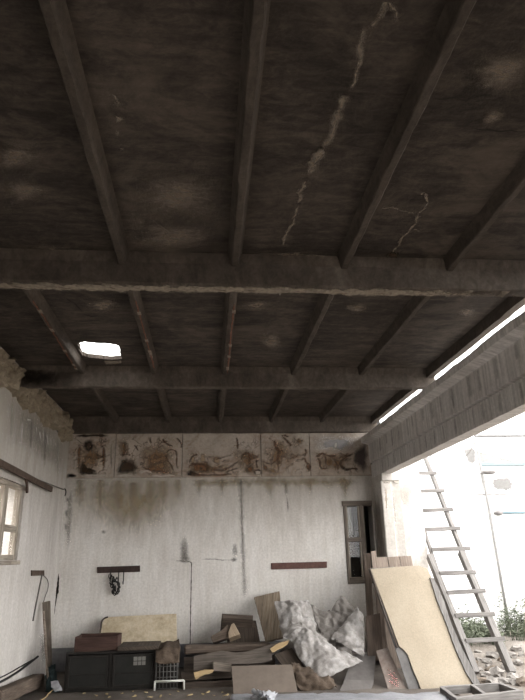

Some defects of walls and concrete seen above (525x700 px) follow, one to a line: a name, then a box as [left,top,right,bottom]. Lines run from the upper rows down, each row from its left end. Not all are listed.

crack [386,193,428,258]
spalling [0,348,74,442]
damp [68,434,159,517]